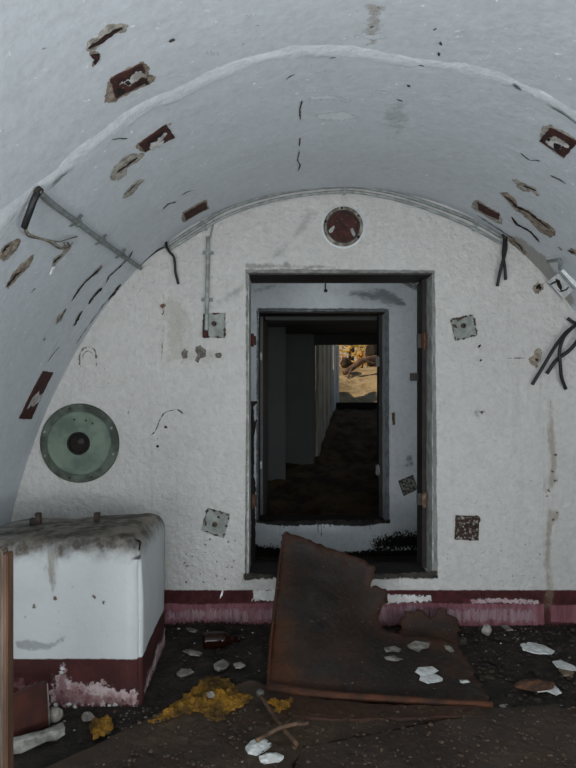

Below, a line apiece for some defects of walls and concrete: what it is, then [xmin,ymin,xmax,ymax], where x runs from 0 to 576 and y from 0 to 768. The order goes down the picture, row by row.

spalling [85,23,129,67]
spalling [104,61,156,103]
spalling [110,123,172,181]
spalling [500,179,556,242]
spalling [0,239,21,261]
spalling [5,254,35,289]
peeling [378,594,576,631]
peeling [49,589,275,708]